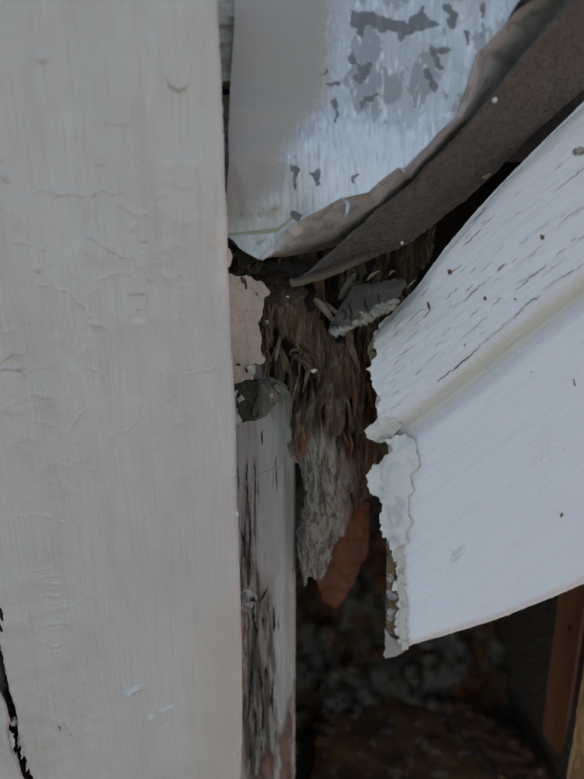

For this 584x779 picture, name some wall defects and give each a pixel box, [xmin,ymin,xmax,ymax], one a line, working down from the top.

crack [555,148,584,191]
peeling [352,298,400,326]
crack [389,170,584,408]
peeling [364,416,420,650]
crack [3,729,30,771]
damp [256,703,295,779]